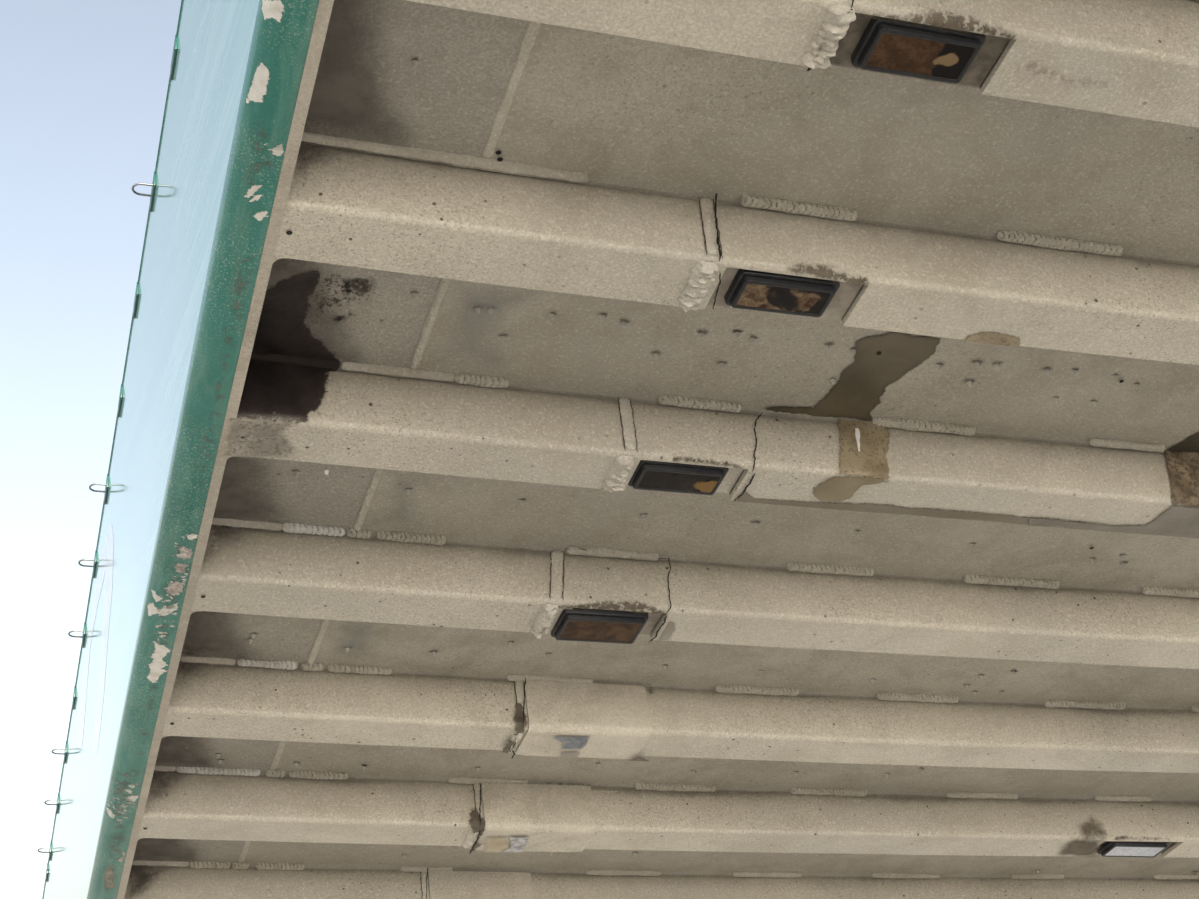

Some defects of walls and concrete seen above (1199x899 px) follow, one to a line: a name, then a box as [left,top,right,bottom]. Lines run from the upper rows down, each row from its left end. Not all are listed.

peeling [246,63,269,104]
peeling [244,185,268,221]
crack [713,193,722,310]
damp [228,271,371,458]
crack [734,412,763,501]
peeling [147,534,198,683]
crack [649,558,671,642]
crack [511,678,526,758]
crack [469,783,482,853]